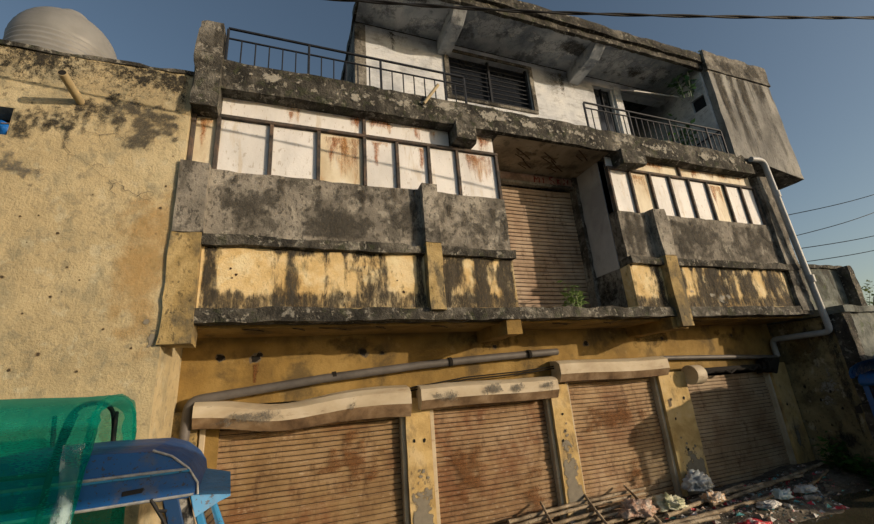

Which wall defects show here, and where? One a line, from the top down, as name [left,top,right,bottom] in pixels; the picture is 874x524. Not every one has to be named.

water stain [0,46,187,148]
water stain [714,60,769,136]
water stain [0,143,40,178]
crack [63,138,150,200]
water stain [221,175,285,231]
water stain [303,186,374,238]
water stain [383,188,417,237]
water stain [444,205,496,246]
water stain [198,246,427,309]
water stain [443,257,519,308]
peeling [561,413,586,516]
peeling [412,469,434,524]